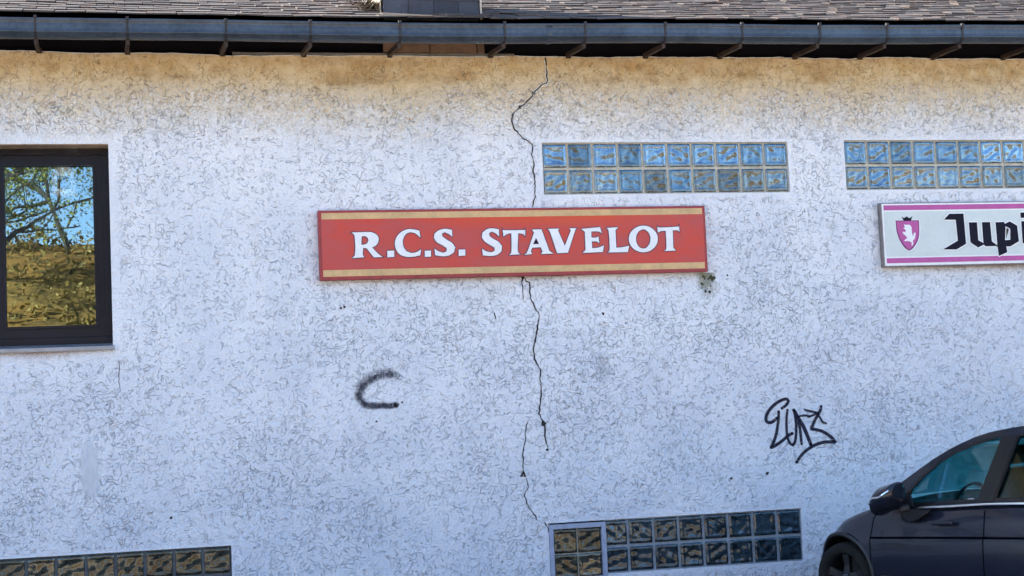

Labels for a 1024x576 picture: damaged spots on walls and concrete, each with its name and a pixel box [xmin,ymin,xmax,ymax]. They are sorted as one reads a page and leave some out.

crack [511,57,549,207]
crack [521,276,549,532]